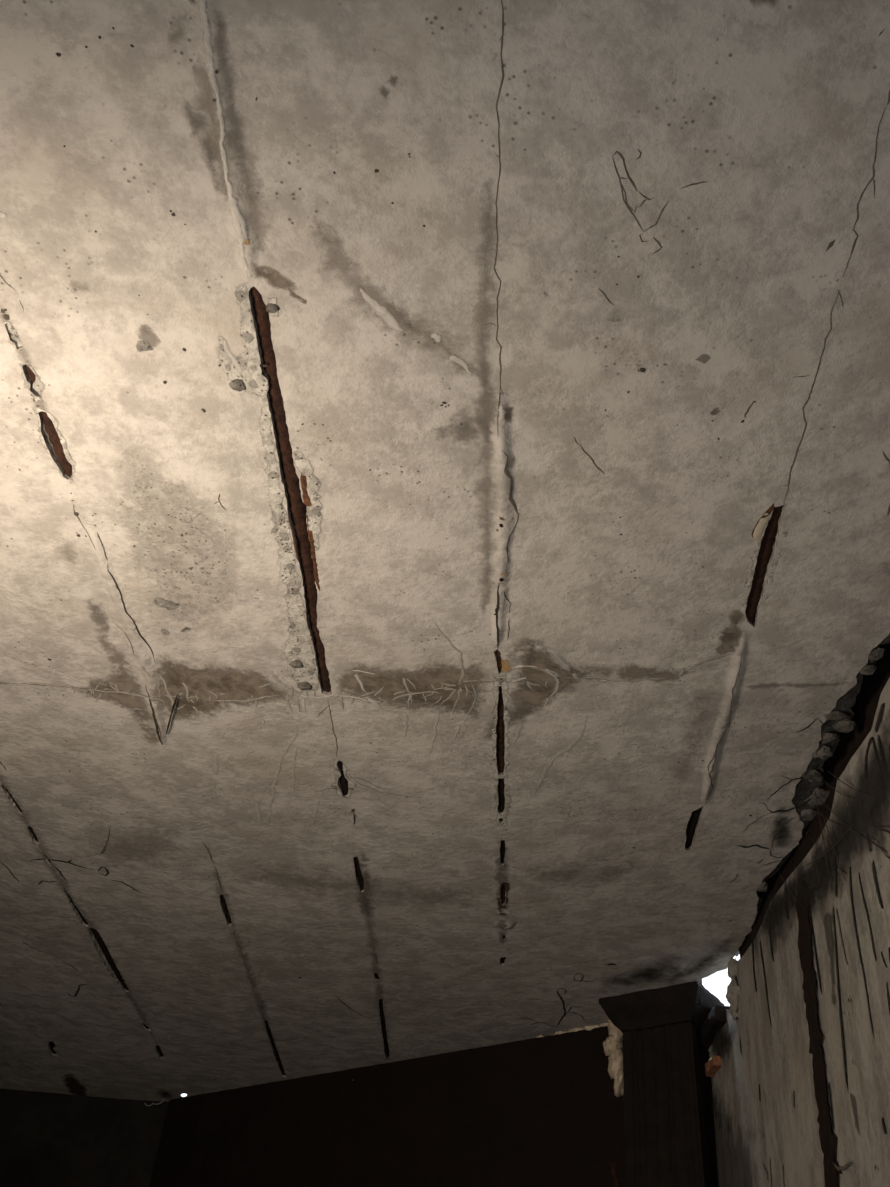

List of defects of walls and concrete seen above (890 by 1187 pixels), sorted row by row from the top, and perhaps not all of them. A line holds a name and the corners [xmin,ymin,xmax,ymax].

crack [612,150,705,254]
damp [359,287,441,342]
crack [485,0,519,647]
crack [783,90,890,505]
damp [439,355,513,459]
spalling [218,284,332,695]
crack [0,507,286,744]
damp [19,605,493,741]
damp [508,611,743,720]
crack [0,829,141,893]
crack [730,772,823,883]
spalling [735,634,890,957]